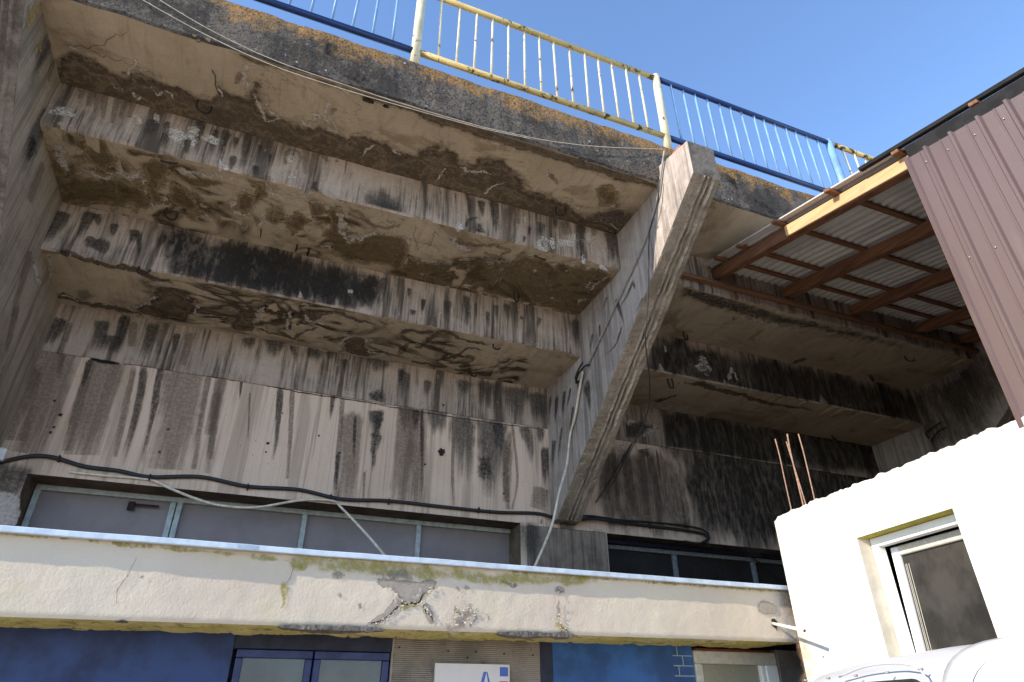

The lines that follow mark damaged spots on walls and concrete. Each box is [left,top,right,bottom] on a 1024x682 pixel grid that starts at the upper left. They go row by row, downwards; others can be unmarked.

leakage [8,38,668,508]
leakage [684,288,893,345]
leakage [603,338,1000,551]
peeling [279,577,490,635]